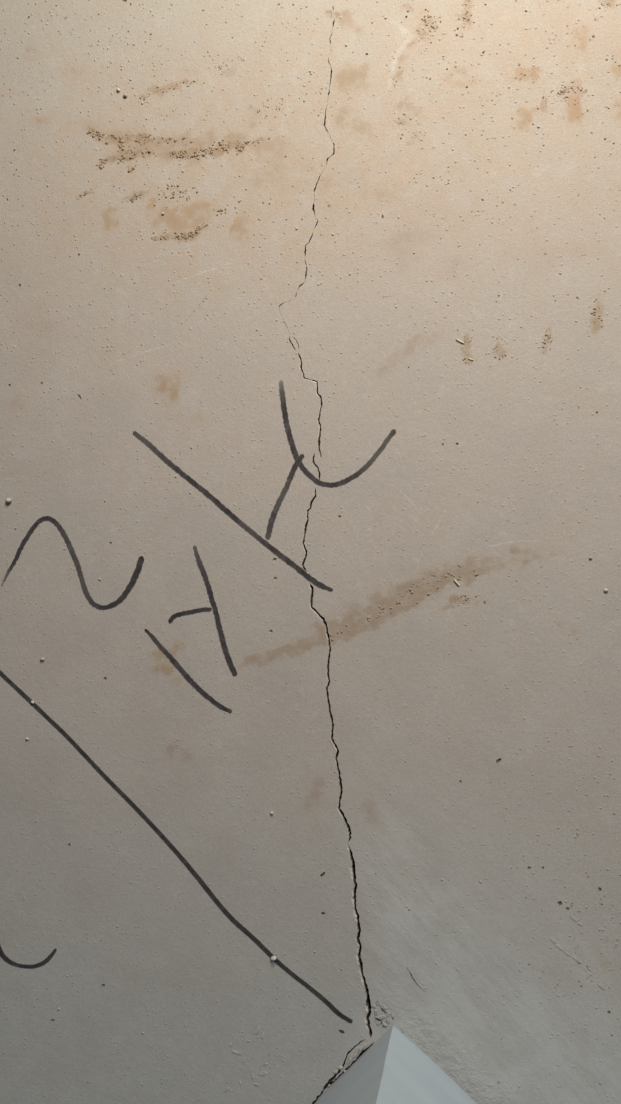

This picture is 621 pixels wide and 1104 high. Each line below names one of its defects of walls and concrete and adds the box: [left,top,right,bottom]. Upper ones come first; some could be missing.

damp [88,126,284,188]
crack [279,5,374,1104]